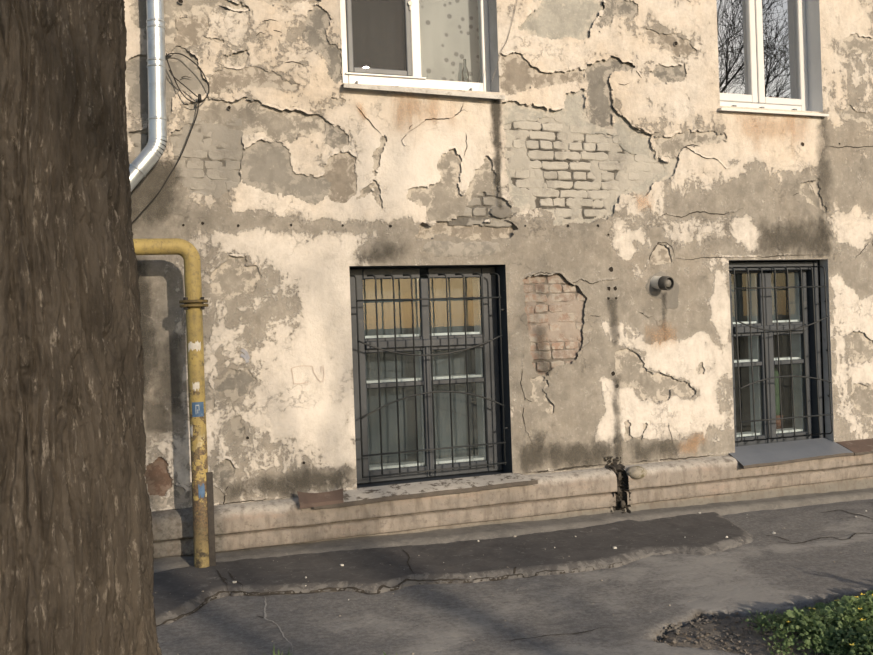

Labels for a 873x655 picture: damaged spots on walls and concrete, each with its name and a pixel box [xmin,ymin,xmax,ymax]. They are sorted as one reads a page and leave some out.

flaking render [128,0,147,36]
flaking render [518,0,639,40]
flaking render [125,53,148,157]
flaking render [164,0,388,208]
crack [401,106,466,146]
flaking render [406,50,727,241]
damp [137,262,154,393]
flaking render [522,270,587,414]
damp [610,300,618,342]
flaking render [610,348,697,403]
damp [521,379,622,470]
damp [636,440,677,458]